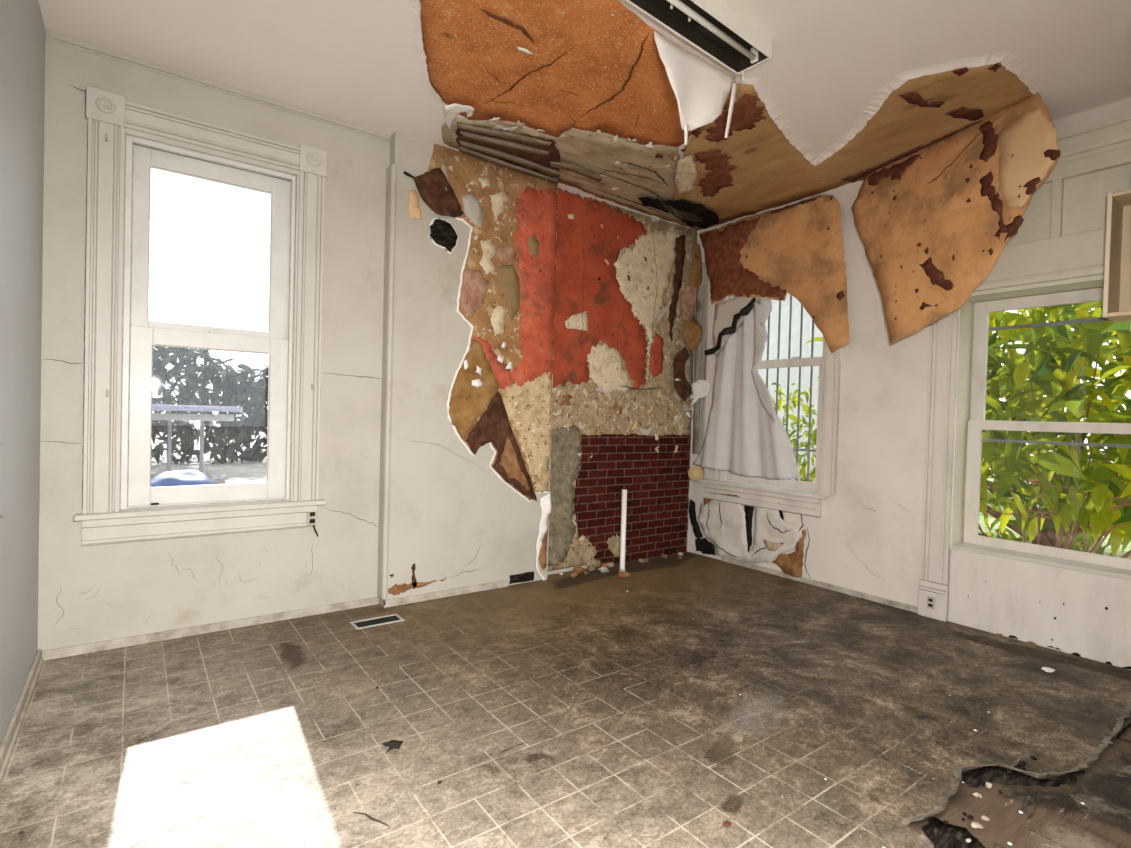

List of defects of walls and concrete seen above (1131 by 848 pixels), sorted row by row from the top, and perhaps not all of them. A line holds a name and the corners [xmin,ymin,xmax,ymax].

peeling [408,0,699,149]
spalling [428,144,716,584]